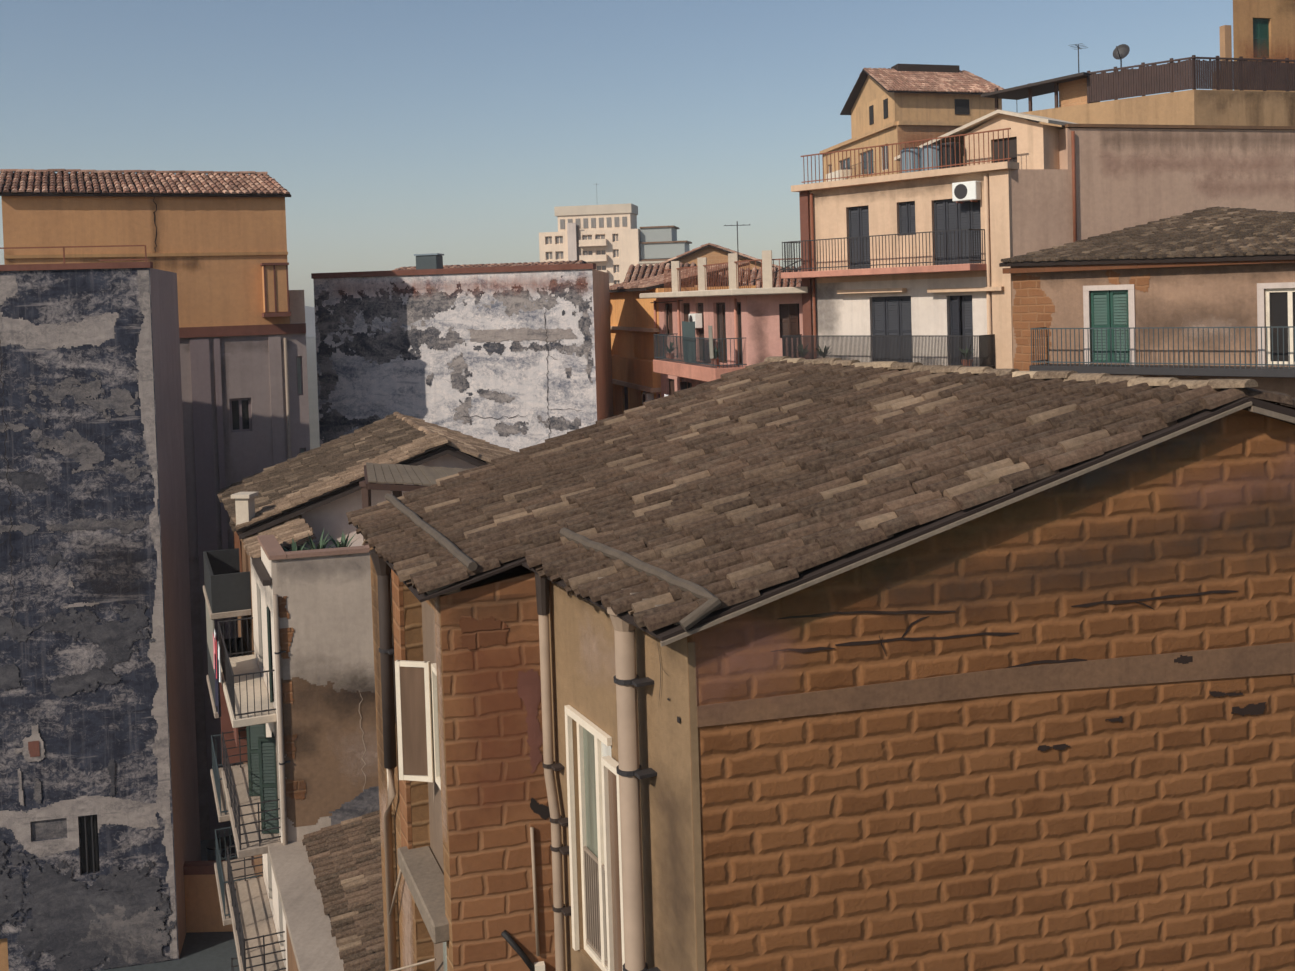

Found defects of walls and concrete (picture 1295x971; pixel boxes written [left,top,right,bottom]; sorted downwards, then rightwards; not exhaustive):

crack [151,197,159,252]
peeling [451,276,592,317]
peeling [465,342,506,356]
peeling [453,392,473,425]
peeling [0,270,178,964]
crack [1071,590,1238,609]
crack [771,610,1087,669]